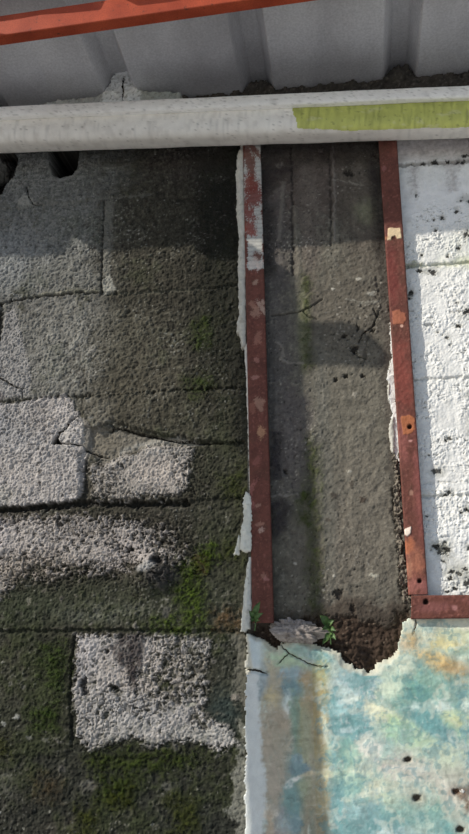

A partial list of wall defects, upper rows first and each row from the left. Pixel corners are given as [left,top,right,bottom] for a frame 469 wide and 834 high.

crack [58,419,108,461]
crack [112,425,221,445]
spalling [303,416,411,673]
crack [248,645,323,674]